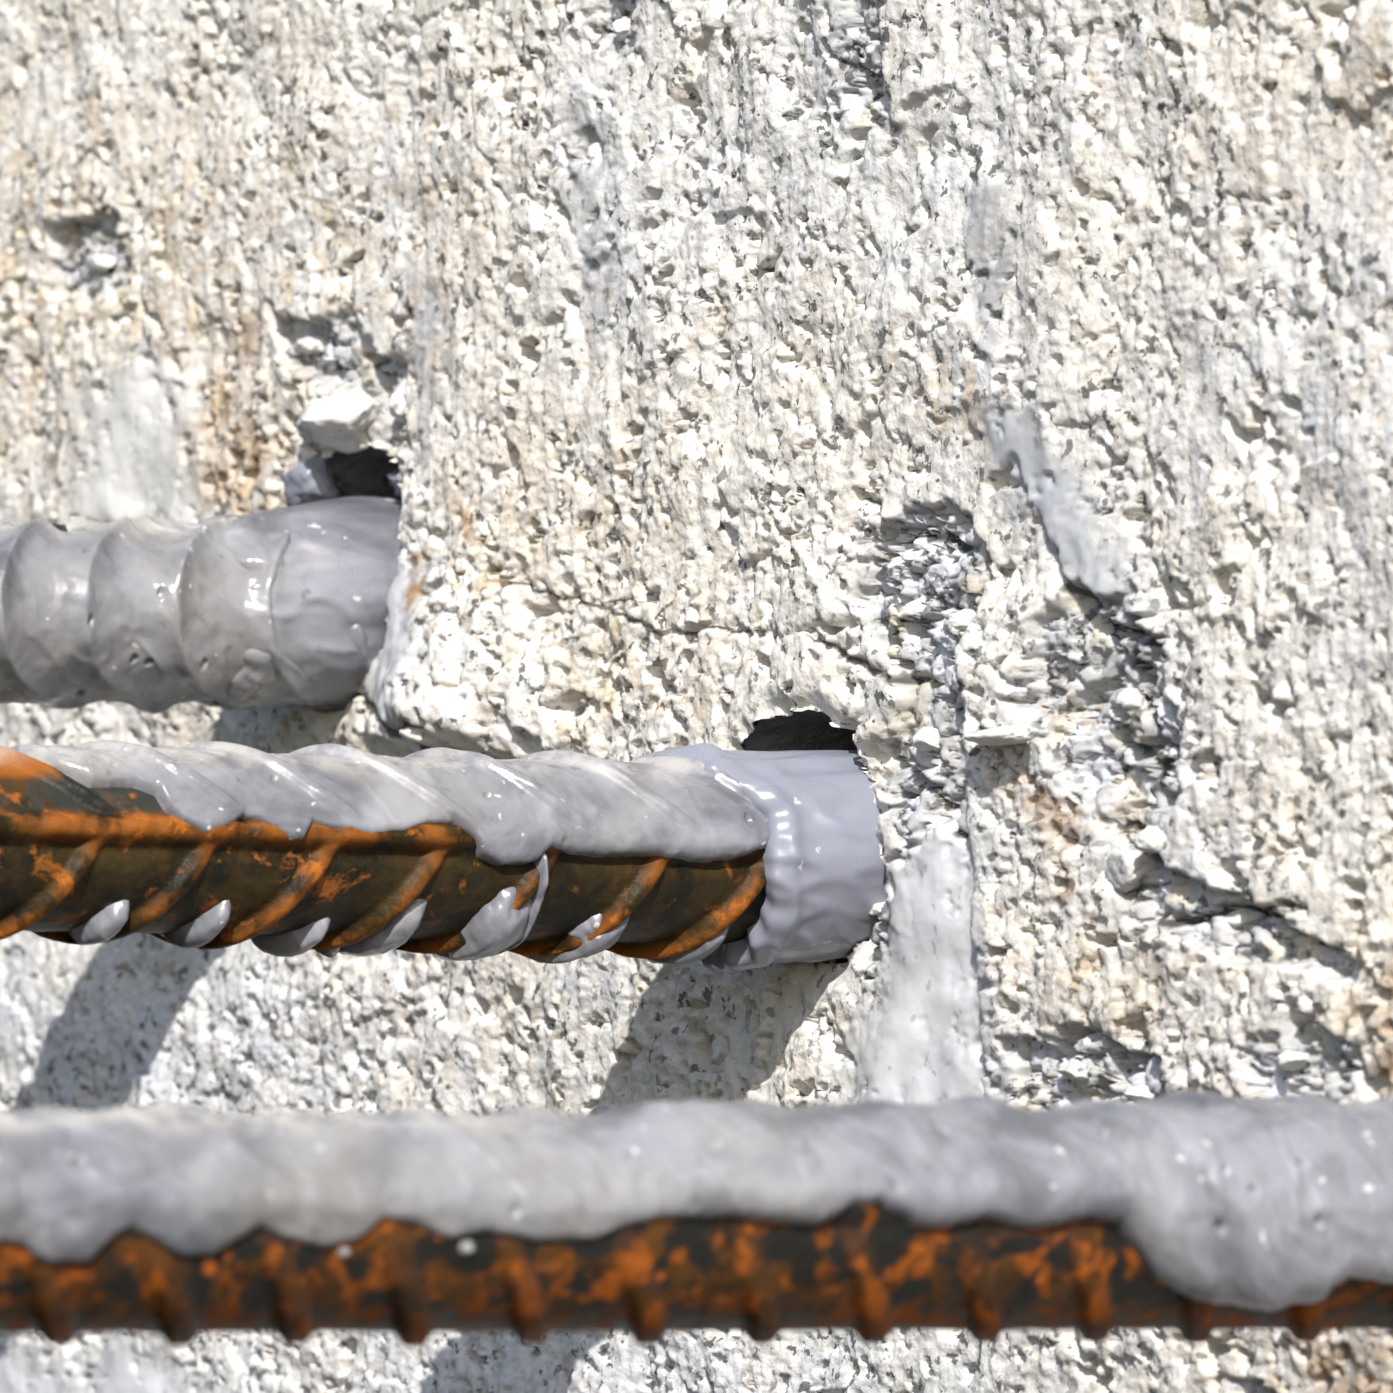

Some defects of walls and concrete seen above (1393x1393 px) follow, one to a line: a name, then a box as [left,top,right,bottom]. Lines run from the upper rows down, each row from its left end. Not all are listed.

spalling [281,316,411,456]
crack [473,567,939,684]
spalling [859,503,1365,984]